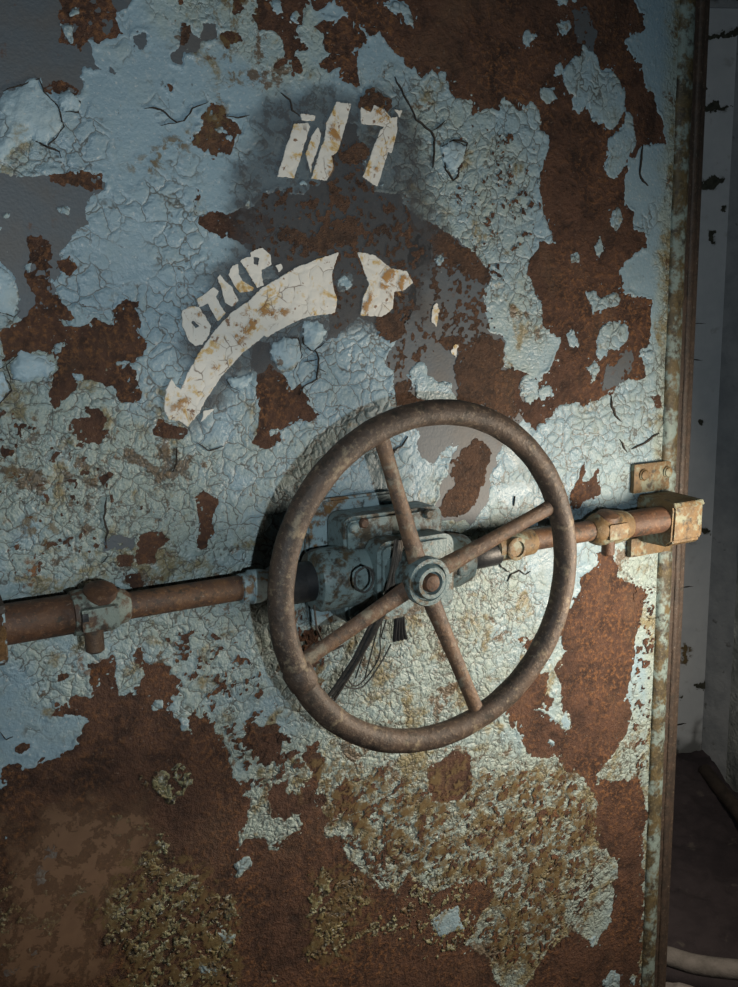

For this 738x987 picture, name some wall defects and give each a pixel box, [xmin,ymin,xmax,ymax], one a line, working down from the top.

peeling [0,0,132,319]
crack [395,77,468,181]
corrosion [193,189,275,245]
corrosion [219,0,667,431]
peeling [227,123,525,424]
peeling [6,350,55,383]
crack [173,442,224,472]
corrosion [252,364,320,449]
crack [299,350,325,395]
peeling [415,425,503,526]
crack [101,497,109,563]
corrosion [0,552,655,987]